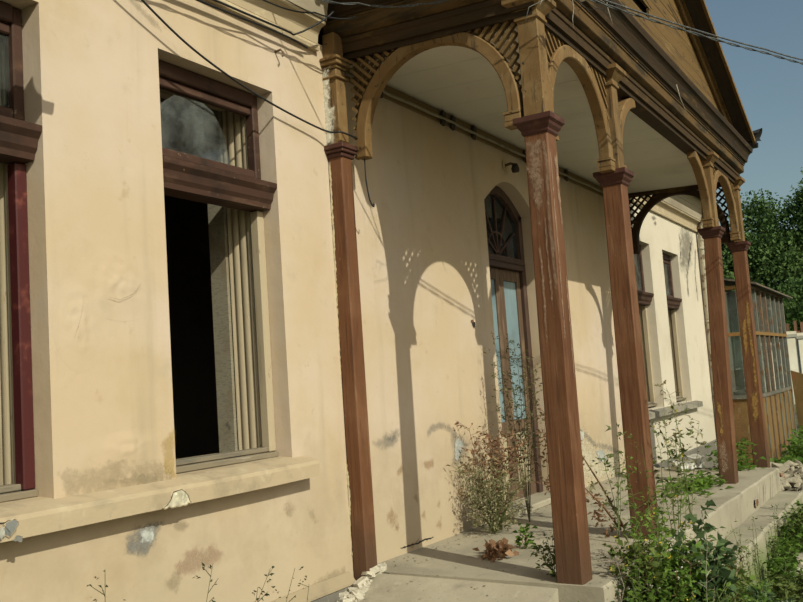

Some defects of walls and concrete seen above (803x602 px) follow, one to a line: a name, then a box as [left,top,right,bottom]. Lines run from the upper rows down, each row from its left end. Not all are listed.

peeling [322,69,334,143]
peeling [0,518,22,542]
peeling [128,525,158,554]